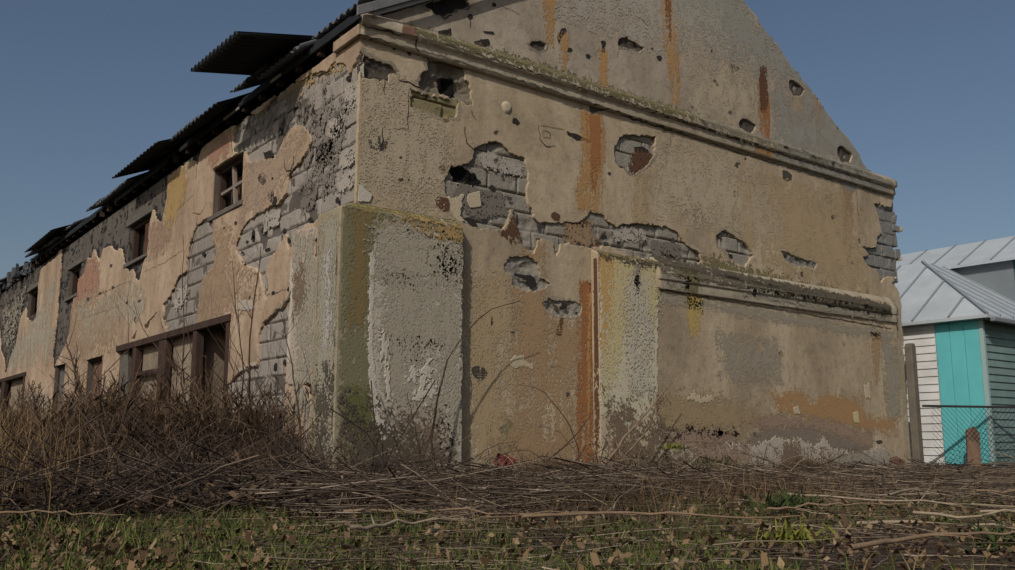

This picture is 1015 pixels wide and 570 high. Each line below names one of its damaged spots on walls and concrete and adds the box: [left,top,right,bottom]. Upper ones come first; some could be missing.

spalling [422,0,473,36]
spalling [474,31,494,47]
rust [542,0,570,71]
rust [659,0,682,105]
rust [755,66,775,159]
spalling [0,152,200,372]
spalling [132,47,472,455]
damp [173,62,524,477]
rust [486,108,663,471]
spalling [429,130,905,469]
damp [553,0,902,473]